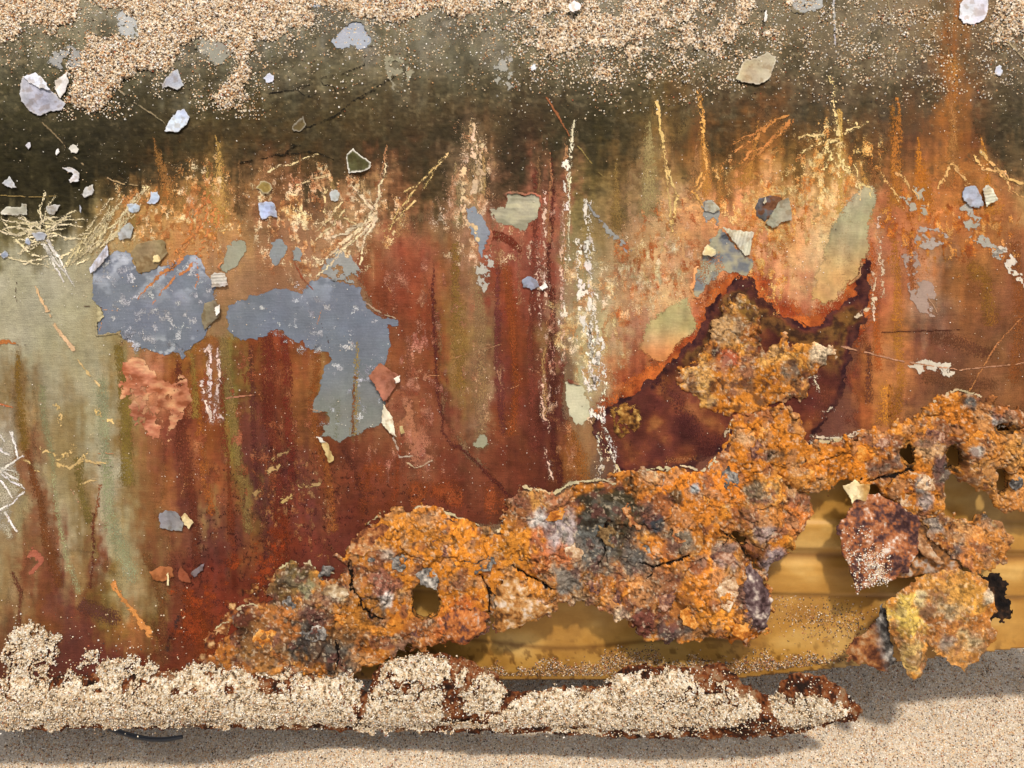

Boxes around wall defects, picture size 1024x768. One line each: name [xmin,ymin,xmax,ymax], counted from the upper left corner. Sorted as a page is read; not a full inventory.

peeling [19,44,82,116]
peeling [62,167,94,213]
peeling [89,191,405,463]
leakage [175,342,352,573]
crack [348,562,383,619]
rust [0,135,776,679]
leakage [0,76,1024,491]
crack [512,564,553,590]
crack [642,555,690,579]
peeling [637,200,754,363]
rust [592,14,1024,472]
rust [719,391,1024,581]